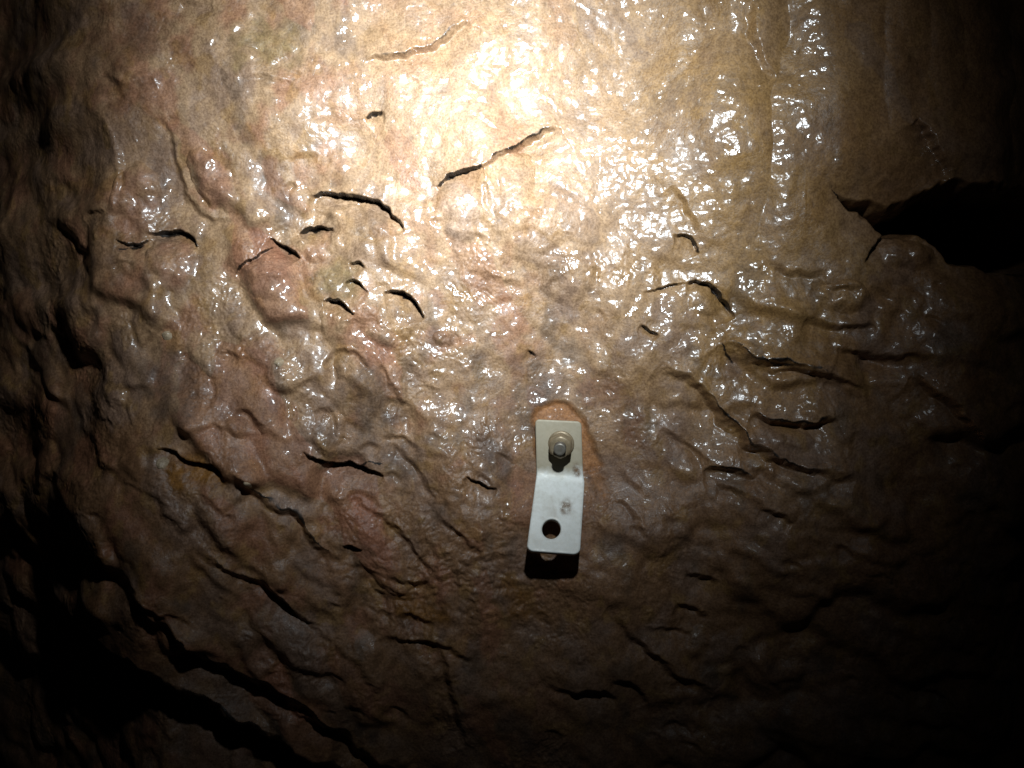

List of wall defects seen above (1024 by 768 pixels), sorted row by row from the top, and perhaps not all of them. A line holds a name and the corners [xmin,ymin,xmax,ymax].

crack [438,127,546,187]
crack [314,191,403,226]
crack [117,229,198,250]
crack [238,225,333,270]
crack [390,290,424,318]
crack [651,279,732,312]
crack [722,342,823,369]
crack [307,454,382,474]
crack [242,480,361,551]